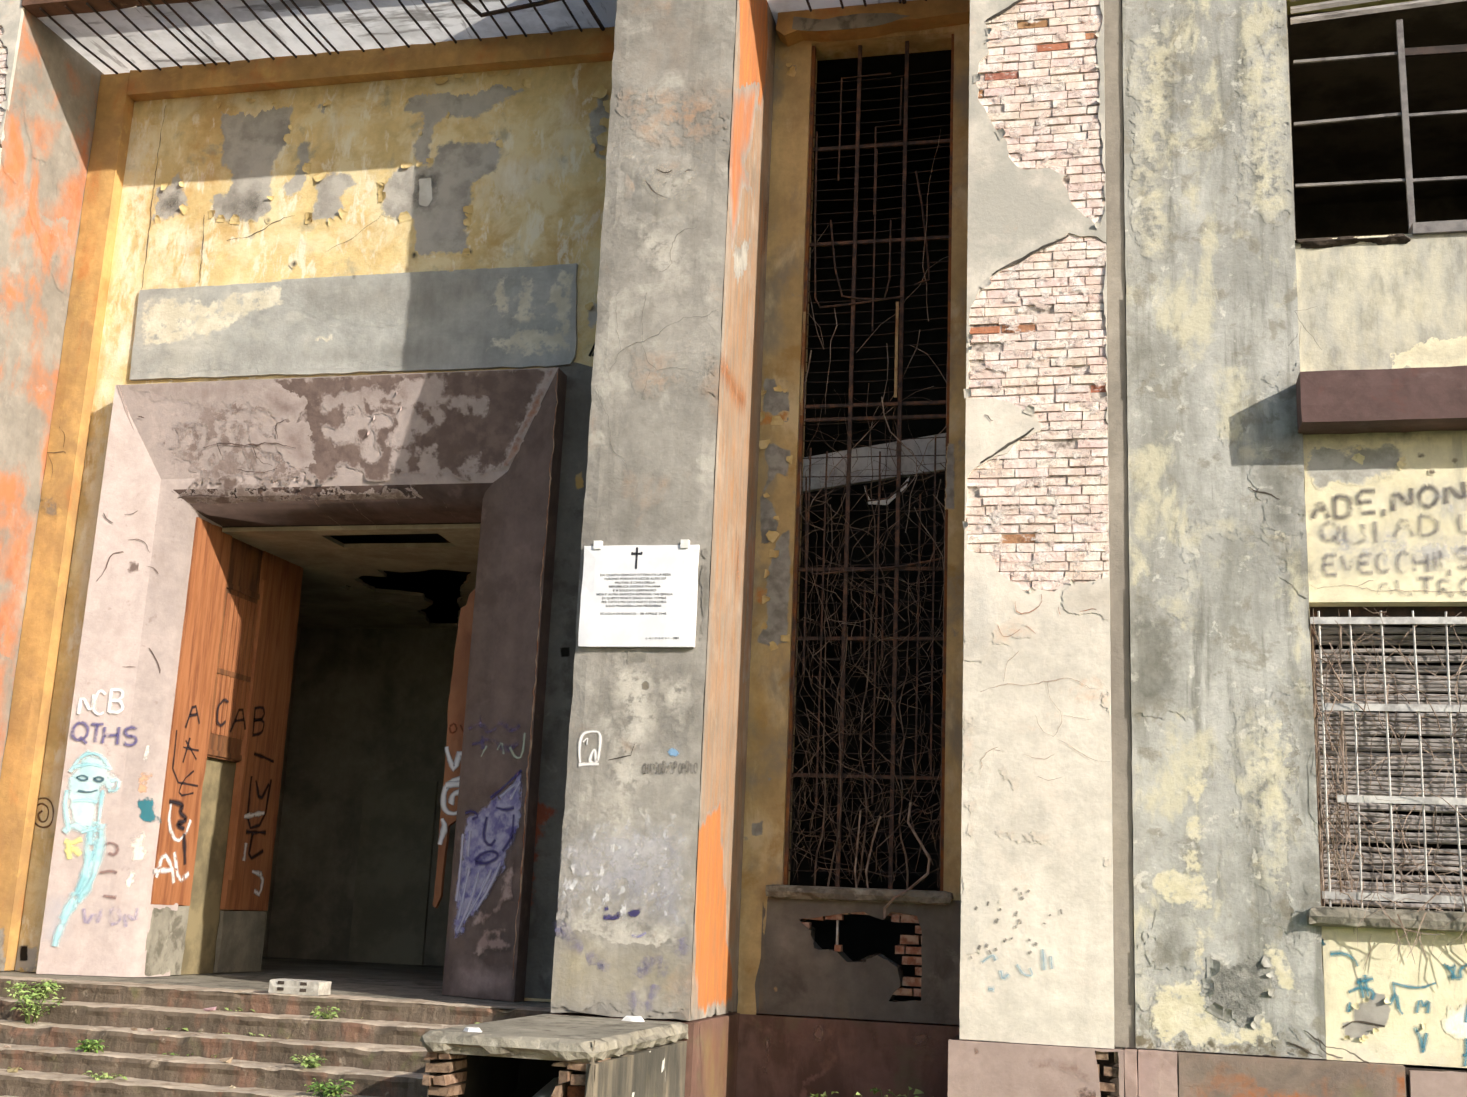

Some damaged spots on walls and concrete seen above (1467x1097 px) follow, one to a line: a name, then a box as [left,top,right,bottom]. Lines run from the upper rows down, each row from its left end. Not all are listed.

peeling [377,69,532,260]
peeling [587,85,610,167]
peeling [194,269,597,504]
flaking render [944,0,1109,593]
damp [1126,294,1158,397]
peeling [0,97,359,972]
rust [691,0,790,1097]
damp [1062,581,1109,620]
damp [1130,585,1195,721]
damp [1135,683,1466,1088]
spalling [427,1055,567,1097]
rust [1393,1073,1405,1097]